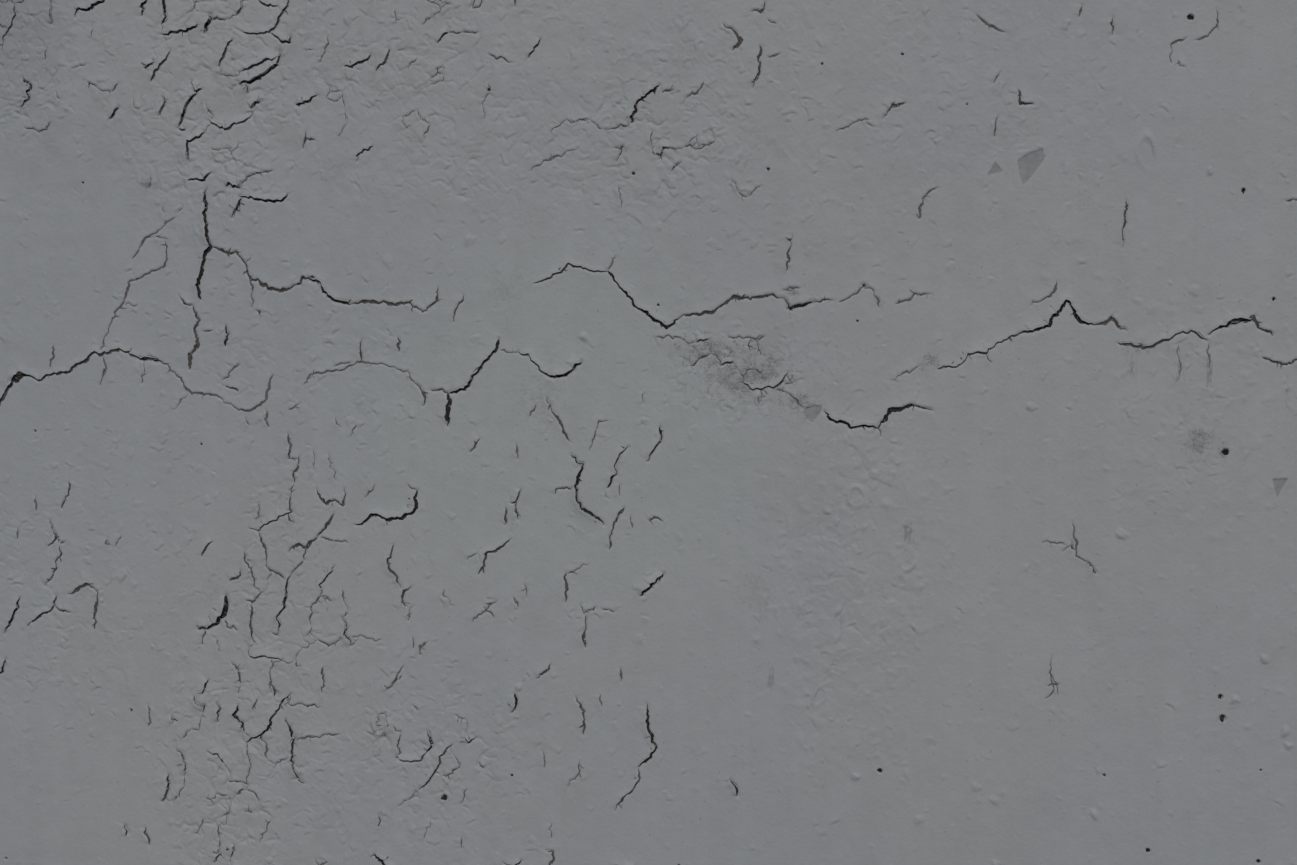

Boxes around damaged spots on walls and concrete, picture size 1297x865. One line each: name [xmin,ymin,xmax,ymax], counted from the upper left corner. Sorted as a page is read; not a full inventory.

crack [916,187,938,218]
crack [1121,202,1129,246]
crack [533,235,929,329]
crack [825,282,1297,436]
crack [0,188,663,674]
crack [288,451,427,689]
crack [1044,525,1096,573]
crack [507,665,550,712]
crack [542,668,623,786]
crack [613,704,657,811]
crack [371,817,394,865]
crack [504,824,555,865]